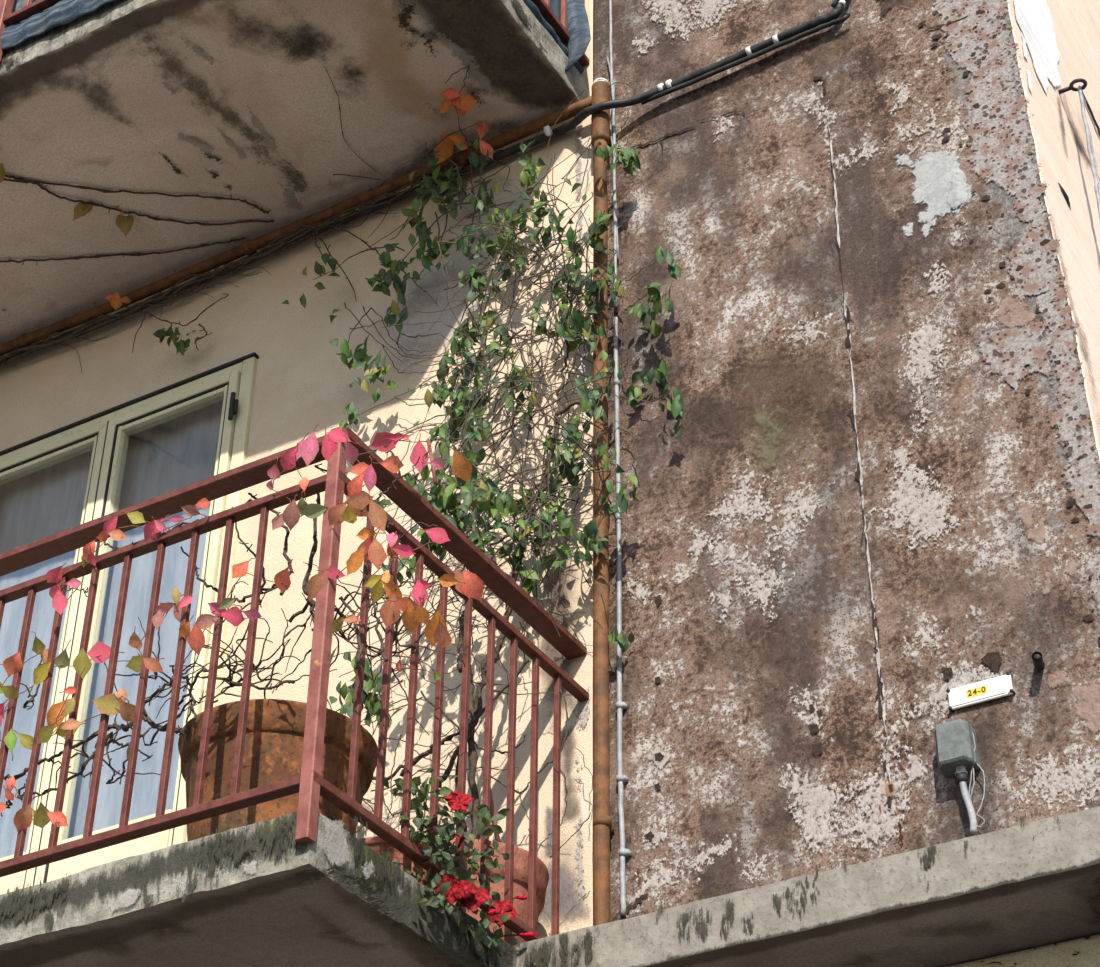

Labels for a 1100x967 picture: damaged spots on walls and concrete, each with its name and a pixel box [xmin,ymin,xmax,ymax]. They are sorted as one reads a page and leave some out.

crack [630,92,788,160]
peeling [713,115,736,141]
flaking render [803,0,1100,551]
crack [813,76,903,845]
flaking render [1066,558,1100,622]
peeling [1048,670,1100,732]
peeling [1014,747,1100,815]
water stain [0,873,71,933]
water stain [523,929,595,967]
water stain [656,898,754,943]
water stain [767,864,821,918]
water stain [917,841,942,889]